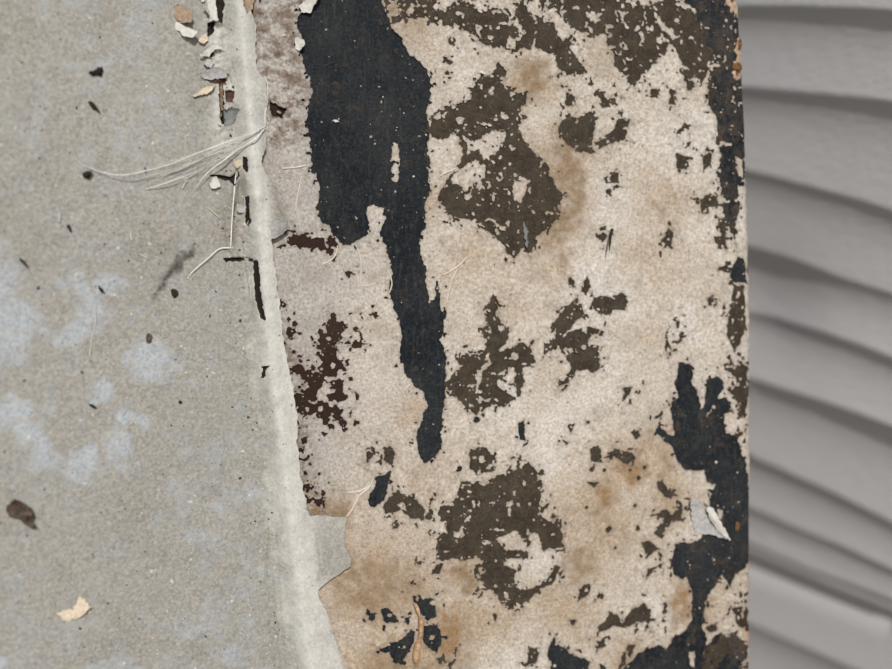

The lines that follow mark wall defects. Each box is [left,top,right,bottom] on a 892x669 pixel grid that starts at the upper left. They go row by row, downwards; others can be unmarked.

peeling [173,5,222,68]
peeling [201,0,219,21]
spalling [193,78,240,127]
spalling [269,101,286,118]
peeling [277,0,745,463]
peeling [280,299,379,511]
peeling [587,257,750,669]
peeling [363,421,567,669]
peeling [574,584,604,601]
peeling [520,633,606,669]